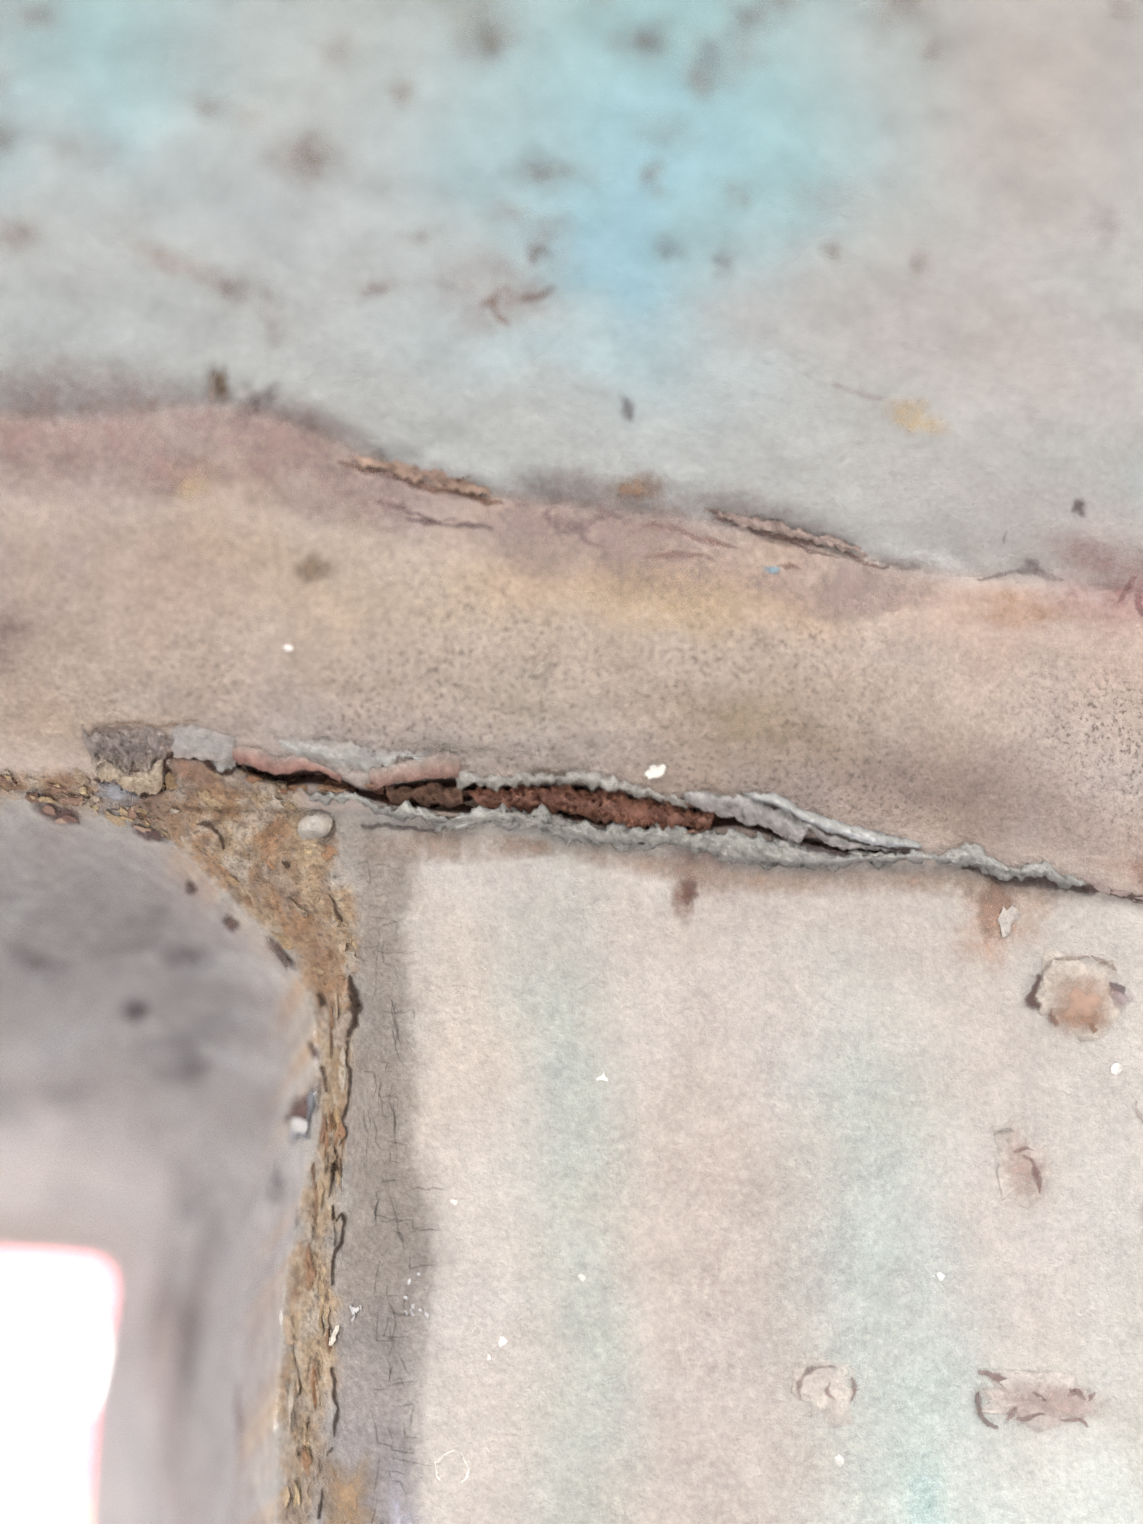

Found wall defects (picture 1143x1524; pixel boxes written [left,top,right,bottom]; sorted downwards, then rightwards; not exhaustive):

peeling [81,719,339,800]
rust [0,768,185,842]
rust [196,790,227,849]
rust [270,792,297,810]
crack [232,736,1143,904]
rust [329,895,360,961]
rust [280,968,346,1524]
crack [317,974,361,1519]